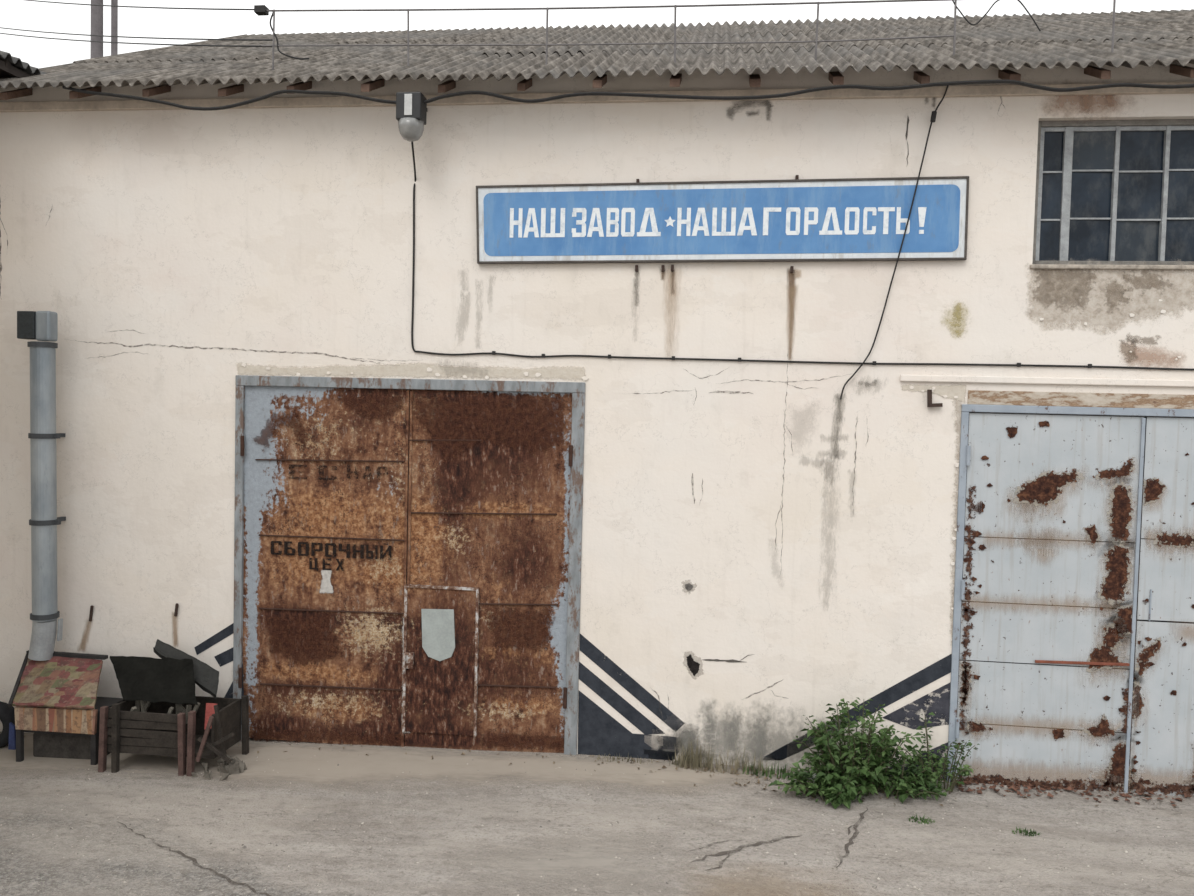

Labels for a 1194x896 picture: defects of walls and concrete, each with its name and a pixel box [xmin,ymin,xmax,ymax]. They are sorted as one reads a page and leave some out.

flaking render [1029,269,1194,332]
crack [75,330,418,366]
flaking render [1124,347,1181,365]
damp [834,396,842,457]
spalling [682,580,697,592]
rust [957,459,1194,795]
spalling [683,652,703,679]